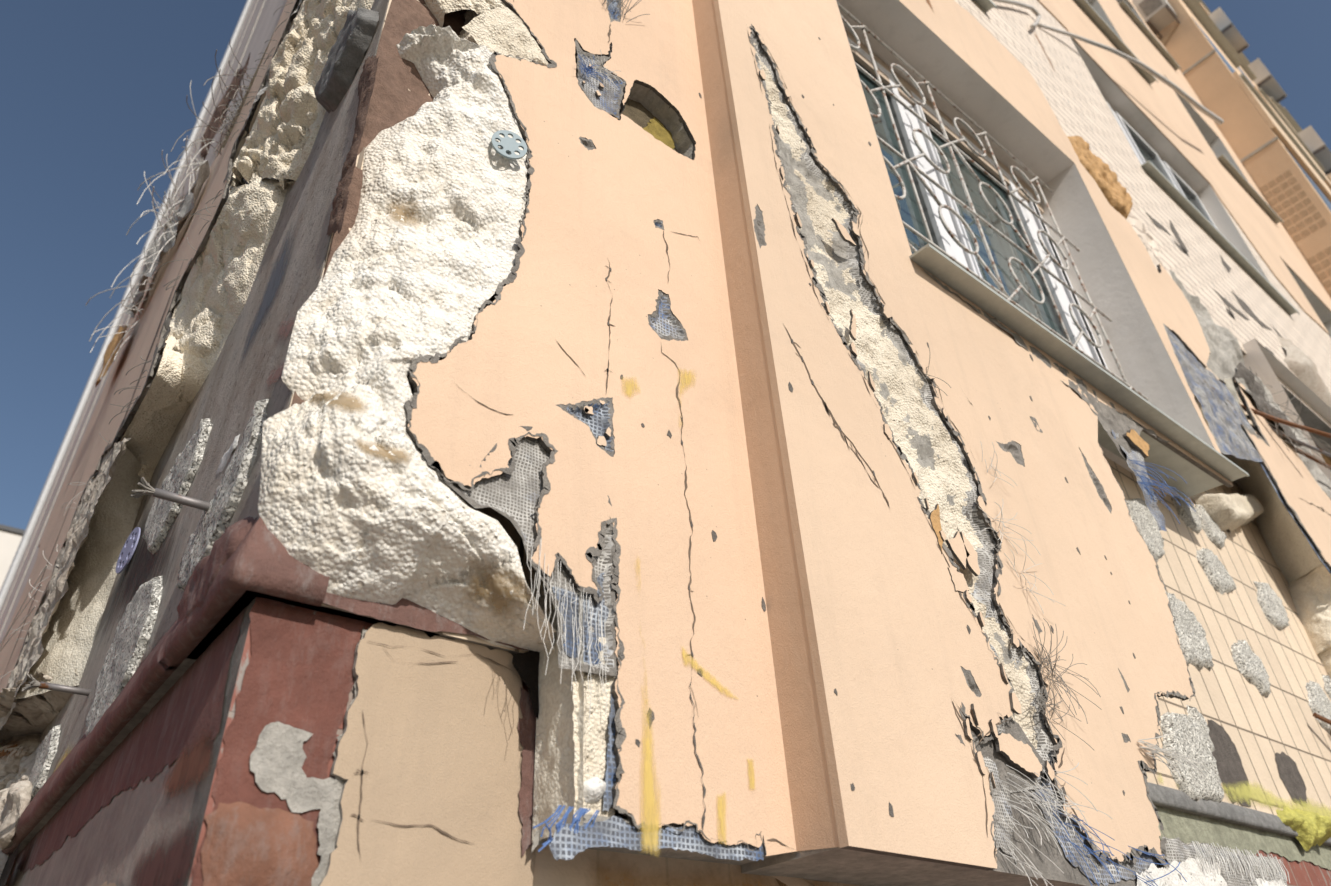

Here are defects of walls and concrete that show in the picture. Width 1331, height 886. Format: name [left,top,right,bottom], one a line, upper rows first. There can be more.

spalling [170,0,297,206]
spalling [322,0,469,280]
crack [663,229,698,282]
spalling [405,0,767,856]
crack [661,345,706,827]
crack [785,327,890,508]
spalling [748,24,1331,886]
peeling [250,721,346,886]